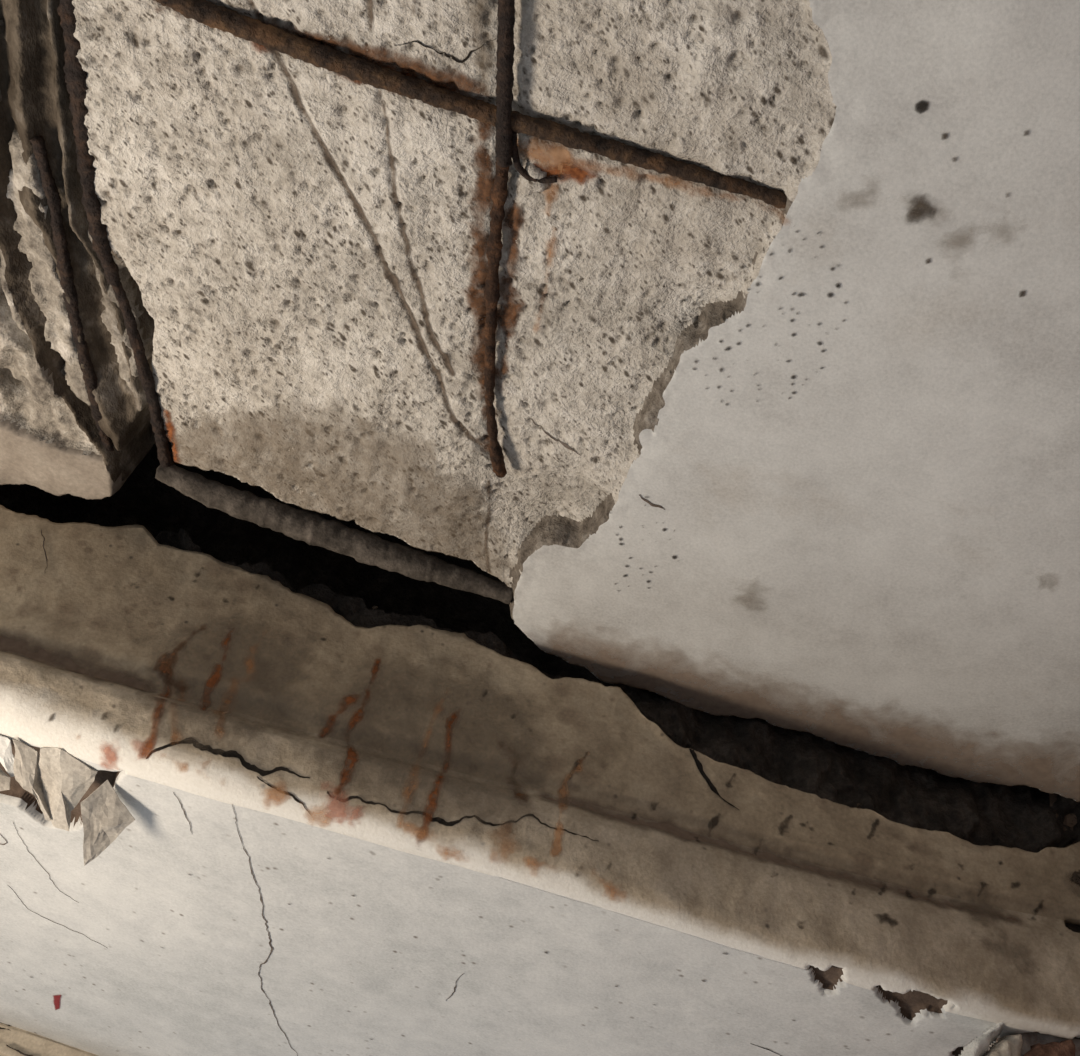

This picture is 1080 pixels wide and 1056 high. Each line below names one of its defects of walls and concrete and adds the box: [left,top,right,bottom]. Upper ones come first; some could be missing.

rust [272,25,483,93]
crack [394,40,493,63]
rust [517,143,595,197]
rust [467,122,523,420]
spalling [0,0,837,680]
rust [139,625,205,757]
peeling [0,735,135,866]
crack [146,737,598,841]
crack [686,738,739,810]
crack [232,806,298,1056]
flaking render [808,965,844,990]
flaking render [876,985,948,1021]